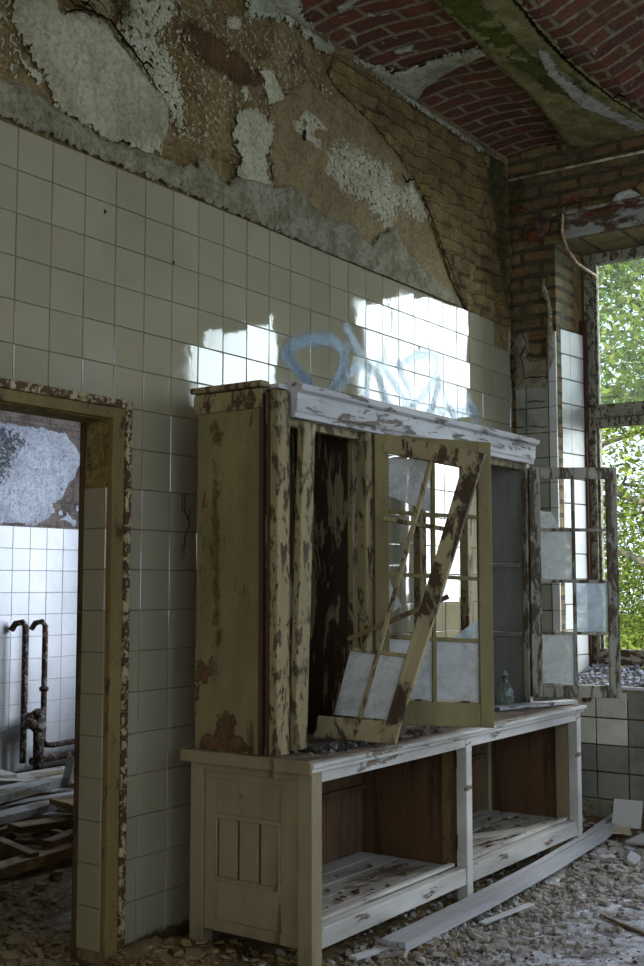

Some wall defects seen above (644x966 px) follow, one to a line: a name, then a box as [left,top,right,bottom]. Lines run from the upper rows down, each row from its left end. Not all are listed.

crack [64,0,161,92]
crack [512,0,644,120]
peeling [537,49,644,131]
spalling [0,0,554,391]
peeling [612,182,644,201]
peeling [0,422,80,527]